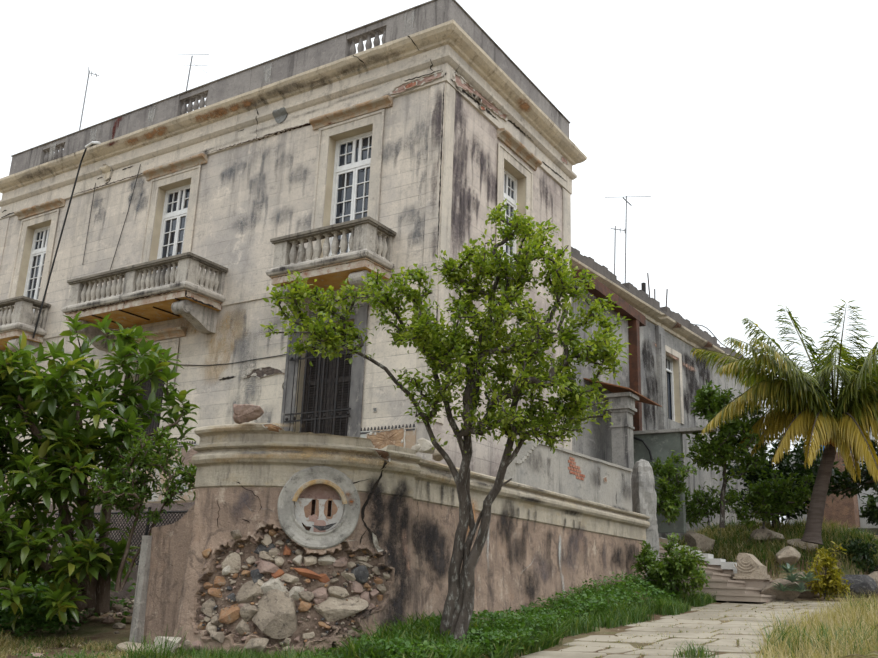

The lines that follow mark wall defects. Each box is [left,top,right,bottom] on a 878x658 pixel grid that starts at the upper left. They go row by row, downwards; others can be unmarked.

damp [432,95,442,140]
spalling [390,71,509,122]
crack [405,36,533,256]
damp [451,87,497,242]
spalling [196,526,391,654]
crack [334,461,387,544]
damp [366,480,450,631]
damp [501,497,541,560]
damp [548,510,583,566]
flaking render [568,457,585,481]